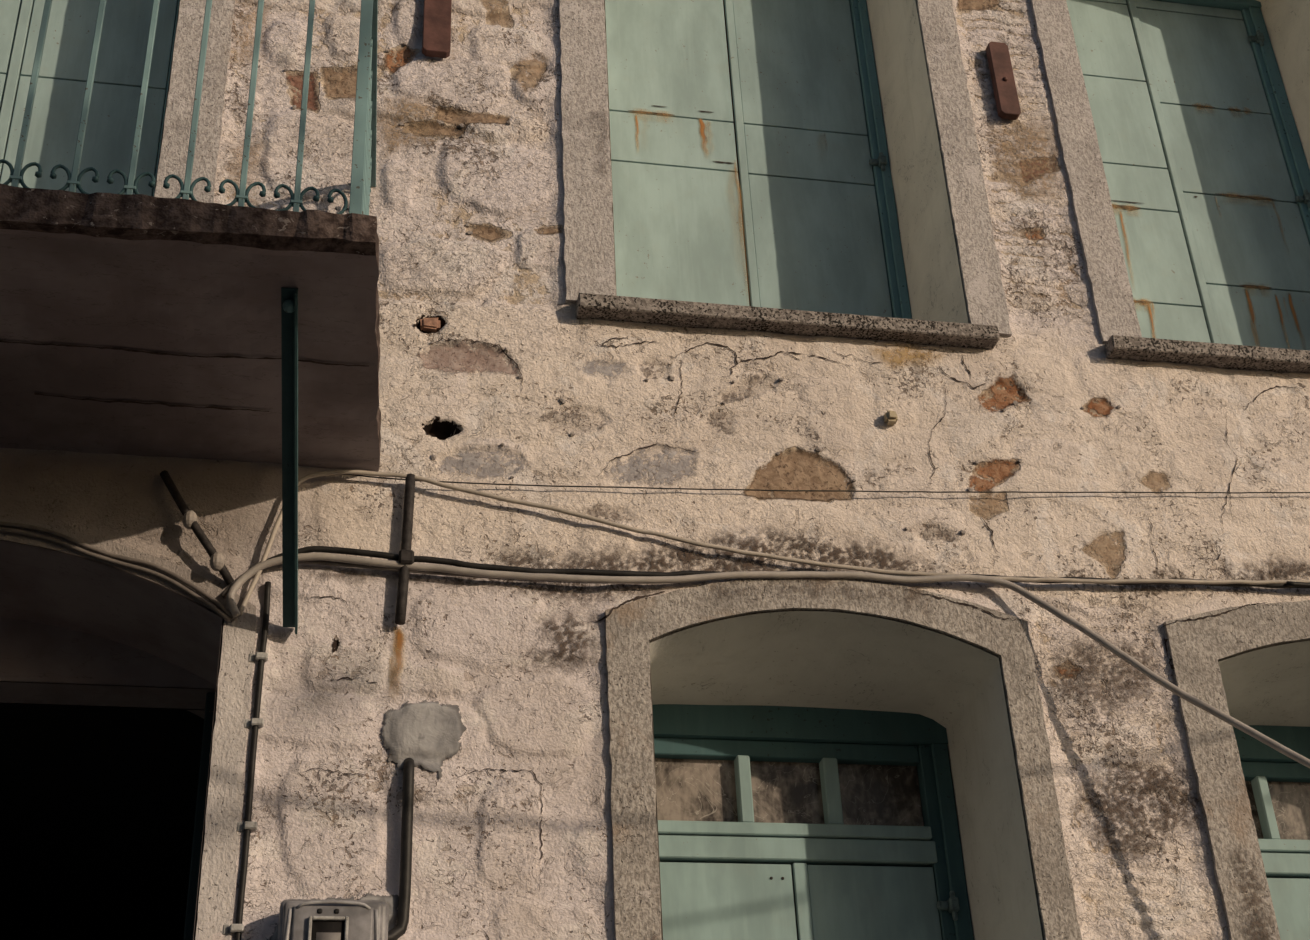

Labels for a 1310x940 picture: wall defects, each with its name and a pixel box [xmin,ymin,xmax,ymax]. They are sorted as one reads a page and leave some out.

rust [628,105,672,139]
rust [699,111,741,209]
rust [1111,200,1141,260]
rust [1240,285,1301,334]
spalling [422,416,463,440]
crack [584,327,883,476]
spalling [978,377,1029,412]
spalling [1080,398,1121,417]
spalling [431,443,528,479]
spalling [744,447,856,502]
spalling [968,459,1022,491]
rust [396,628,404,674]